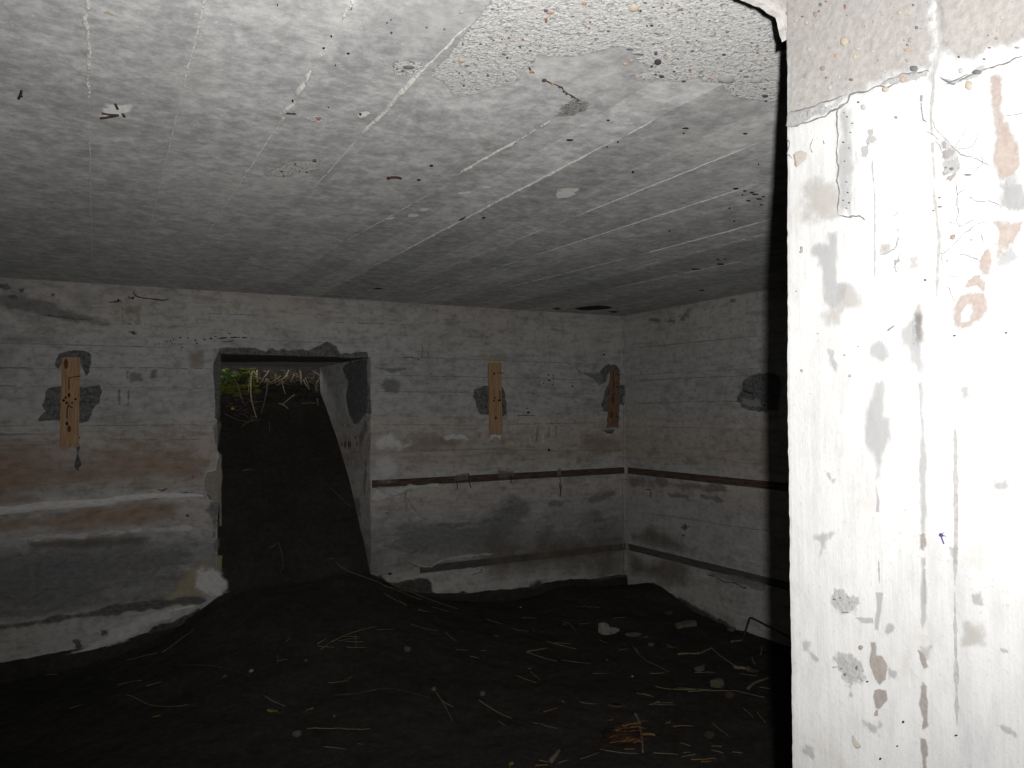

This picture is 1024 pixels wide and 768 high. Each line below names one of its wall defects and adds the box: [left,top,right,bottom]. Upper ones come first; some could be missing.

spalling [392,0,1024,126]
crack [787,56,1022,220]
rust [991,76,1019,179]
crack [921,103,1000,301]
rust [955,221,1021,327]
damp [19,524,194,541]
spalling [832,590,859,613]
spalling [833,653,869,684]